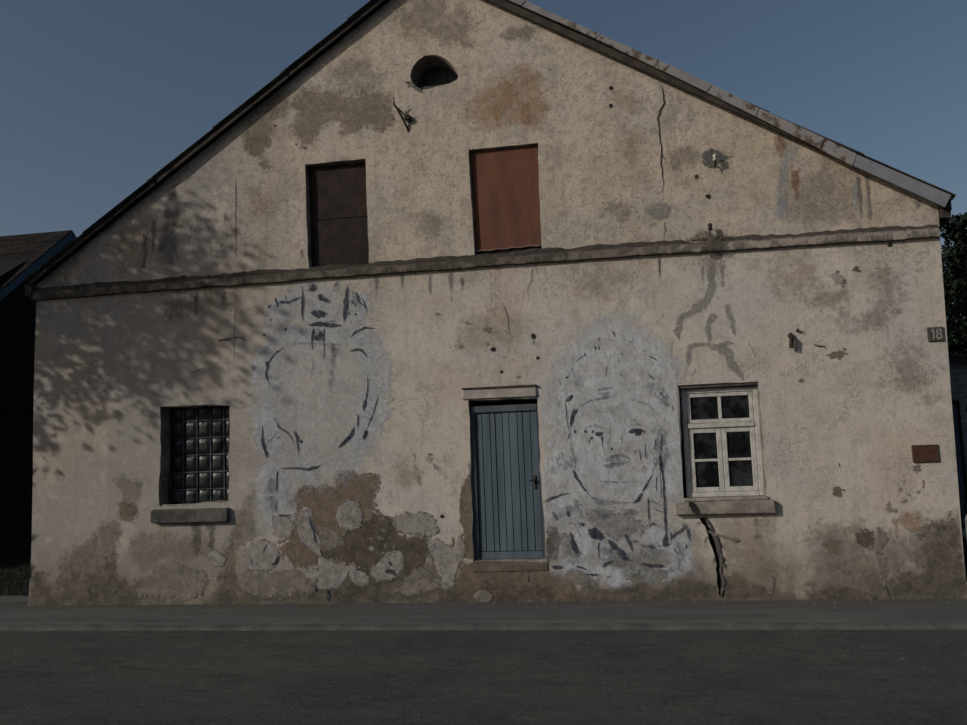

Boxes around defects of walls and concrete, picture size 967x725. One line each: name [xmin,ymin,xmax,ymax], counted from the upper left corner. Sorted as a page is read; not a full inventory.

crack [657,85,665,193]
damp [29,475,142,606]
flaking render [237,463,474,600]
crack [689,501,739,597]
damp [812,514,966,600]